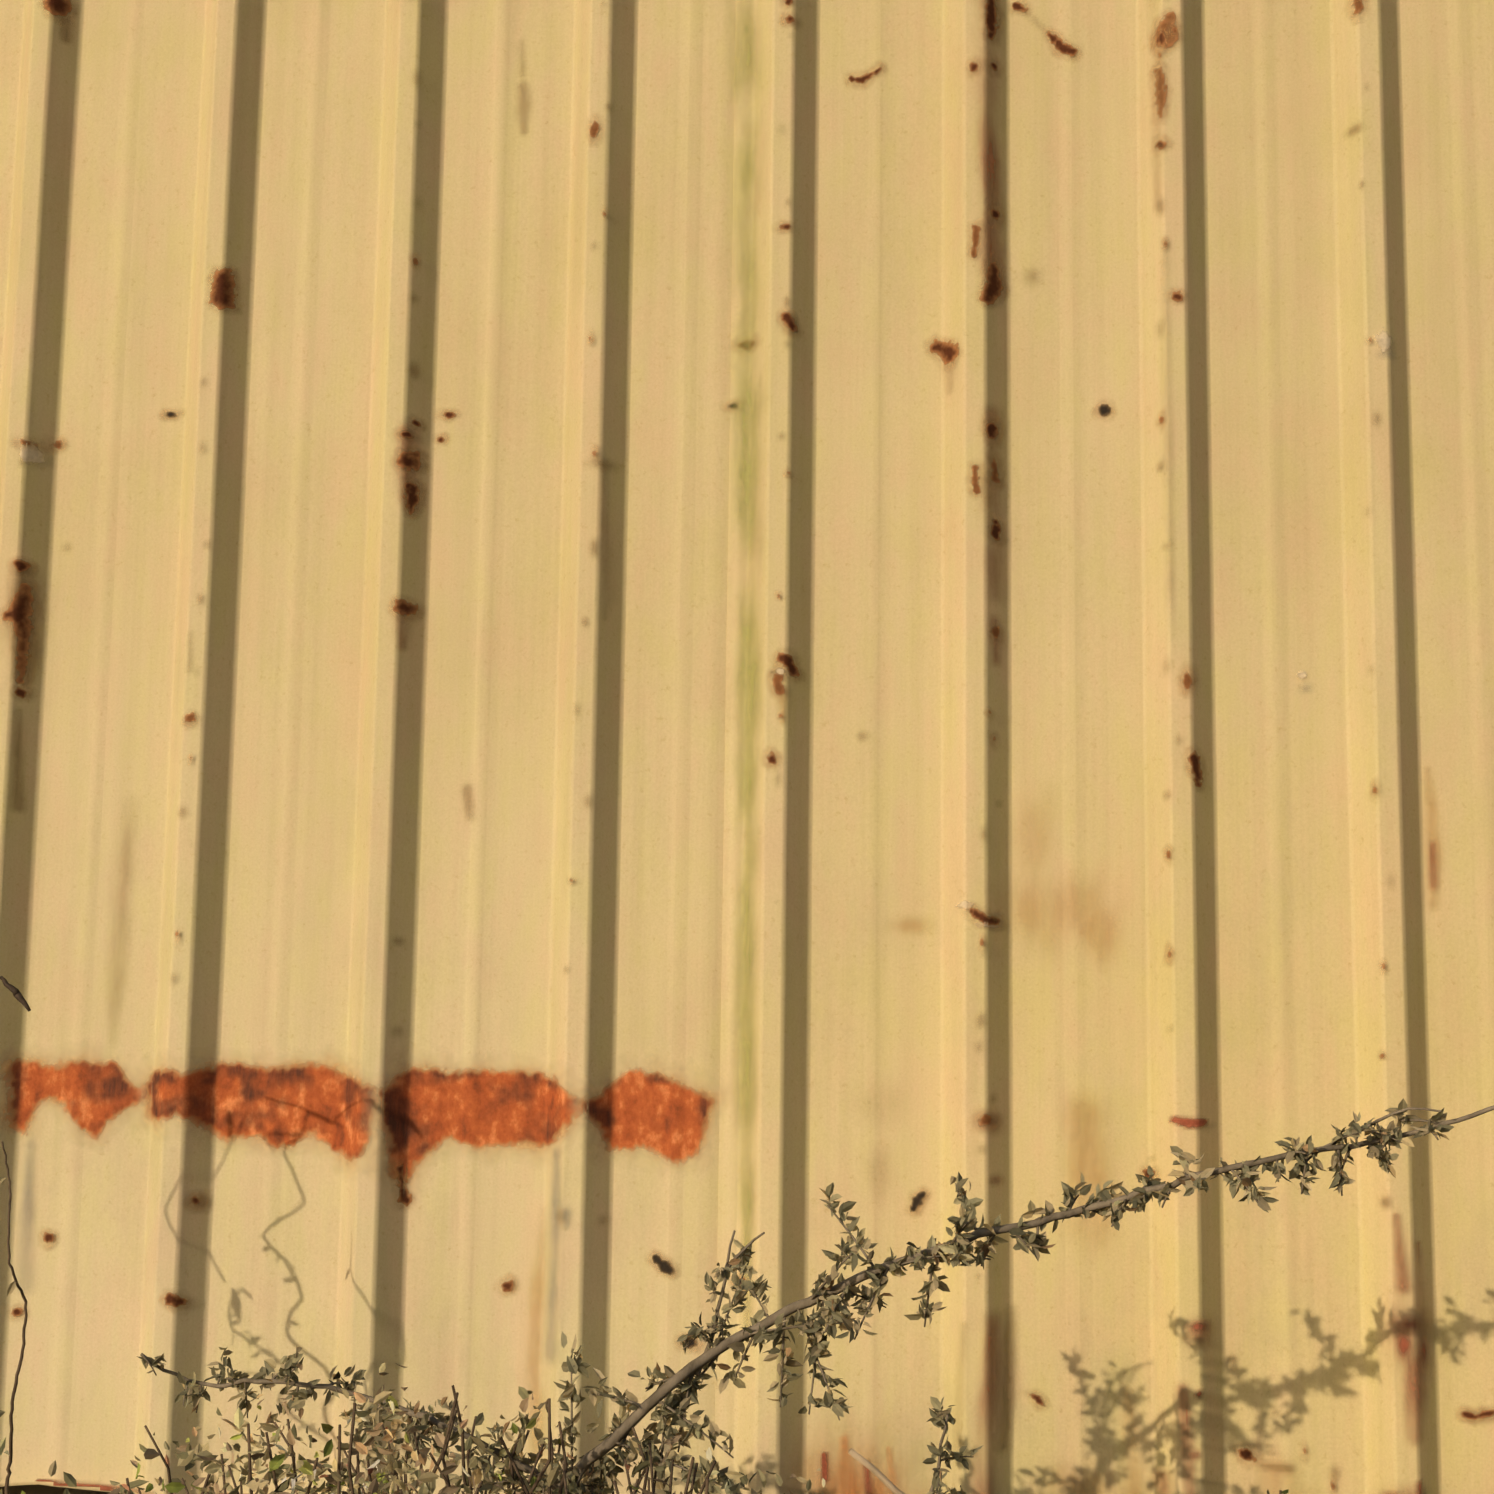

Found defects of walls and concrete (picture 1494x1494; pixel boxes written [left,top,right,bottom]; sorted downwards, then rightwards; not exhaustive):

rust [43,0,72,38]
rust [985,0,1000,41]
rust [969,62,998,72]
rust [1154,11,1179,118]
rust [971,136,1003,306]
rust [209,267,238,310]
rust [930,339,959,365]
rust [396,420,421,515]
rust [2,559,34,698]
rust [772,652,800,695]
rust [1187,750,1203,787]
rust [2,1057,715,1207]